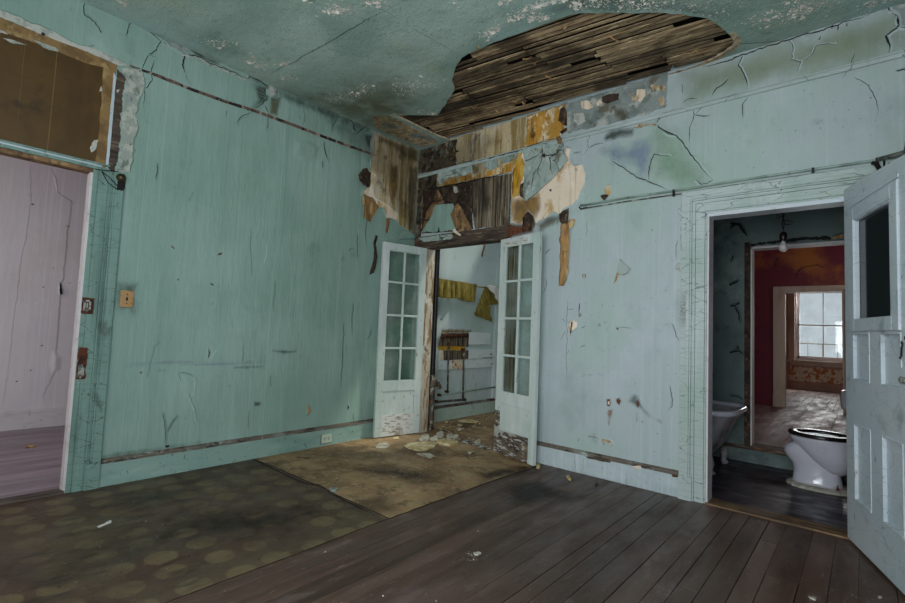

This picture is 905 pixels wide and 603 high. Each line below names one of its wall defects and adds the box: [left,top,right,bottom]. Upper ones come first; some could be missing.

flaking render [0,9,146,176]
crack [83,1,452,128]
peeling [302,0,386,21]
crack [425,139,549,190]
flaking render [357,71,670,286]
crack [574,3,905,191]
crack [2,163,73,406]